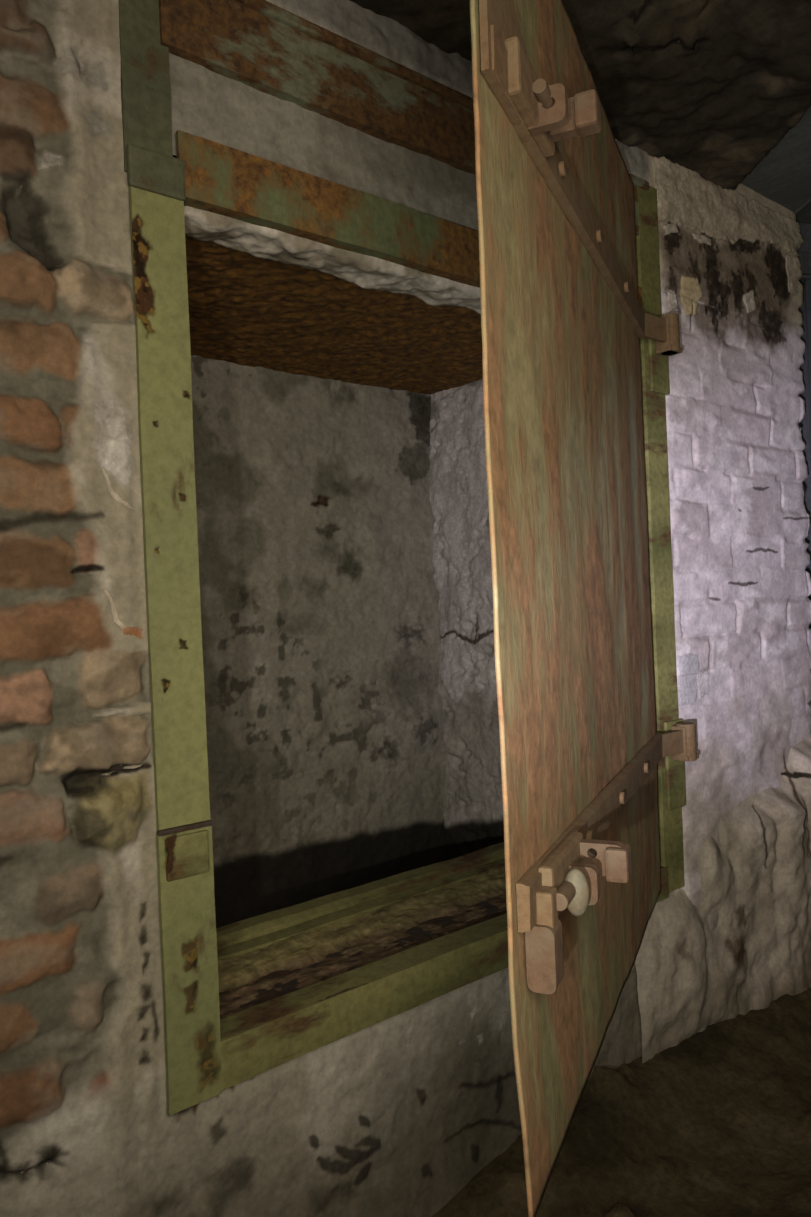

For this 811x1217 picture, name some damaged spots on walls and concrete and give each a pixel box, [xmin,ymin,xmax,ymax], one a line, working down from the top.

rust [132,215,155,332]
water stain [663,221,790,347]
crack [440,617,494,644]
crack [752,805,767,867]
crack [781,760,811,852]
rust [182,938,197,1012]